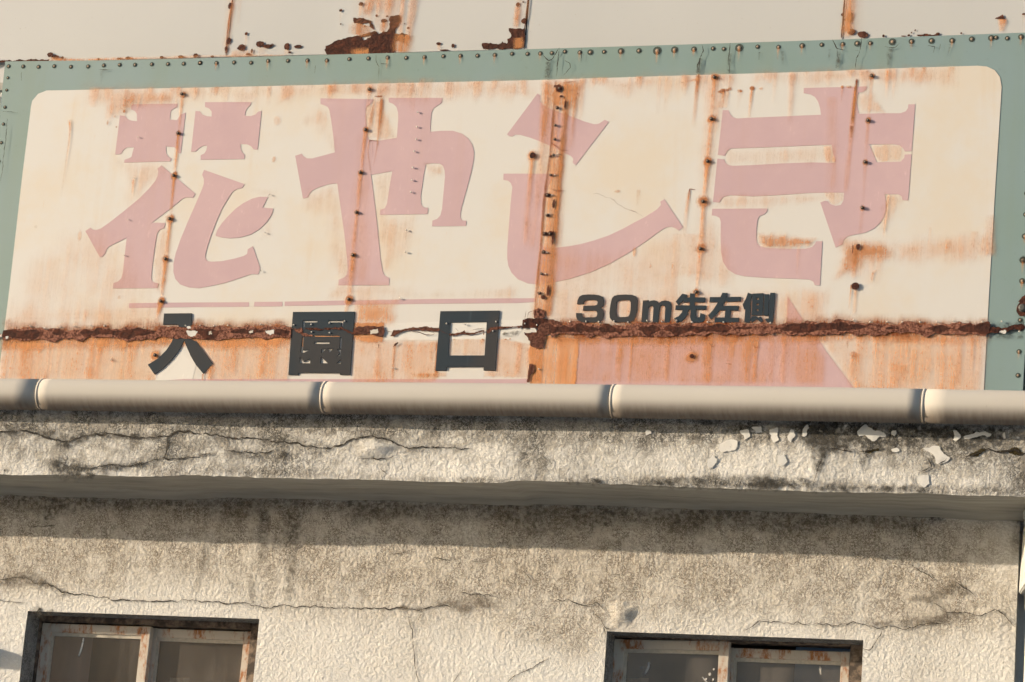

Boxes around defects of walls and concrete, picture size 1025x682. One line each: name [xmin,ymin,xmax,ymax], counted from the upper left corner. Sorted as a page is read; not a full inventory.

corrosion [325,0,412,60]
corrosion [482,0,529,50]
corrosion [2,256,292,379]
damp [50,459,144,480]
crack [0,429,470,473]
peeling [707,424,811,469]
damp [635,476,925,493]
peeling [844,424,899,452]
damp [796,421,1003,471]
peeling [916,445,950,465]
crack [0,577,498,681]
crack [745,564,1014,651]